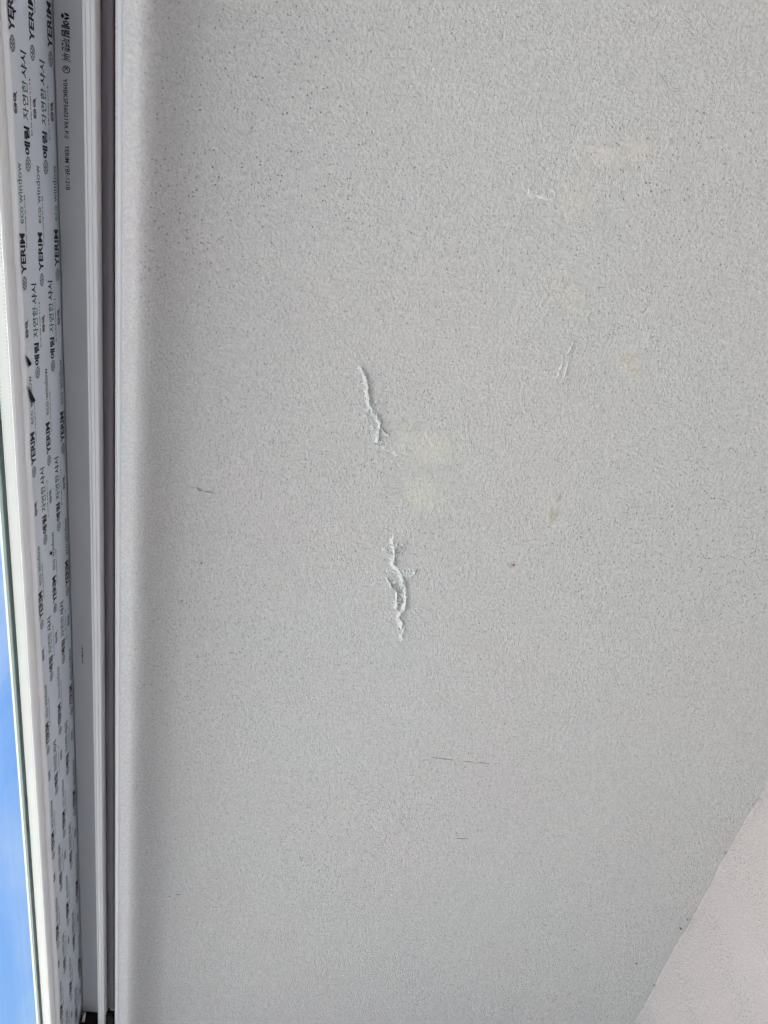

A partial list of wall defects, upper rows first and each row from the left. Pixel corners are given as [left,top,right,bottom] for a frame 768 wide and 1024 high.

crack [357,365,414,459]
crack [382,535,417,642]